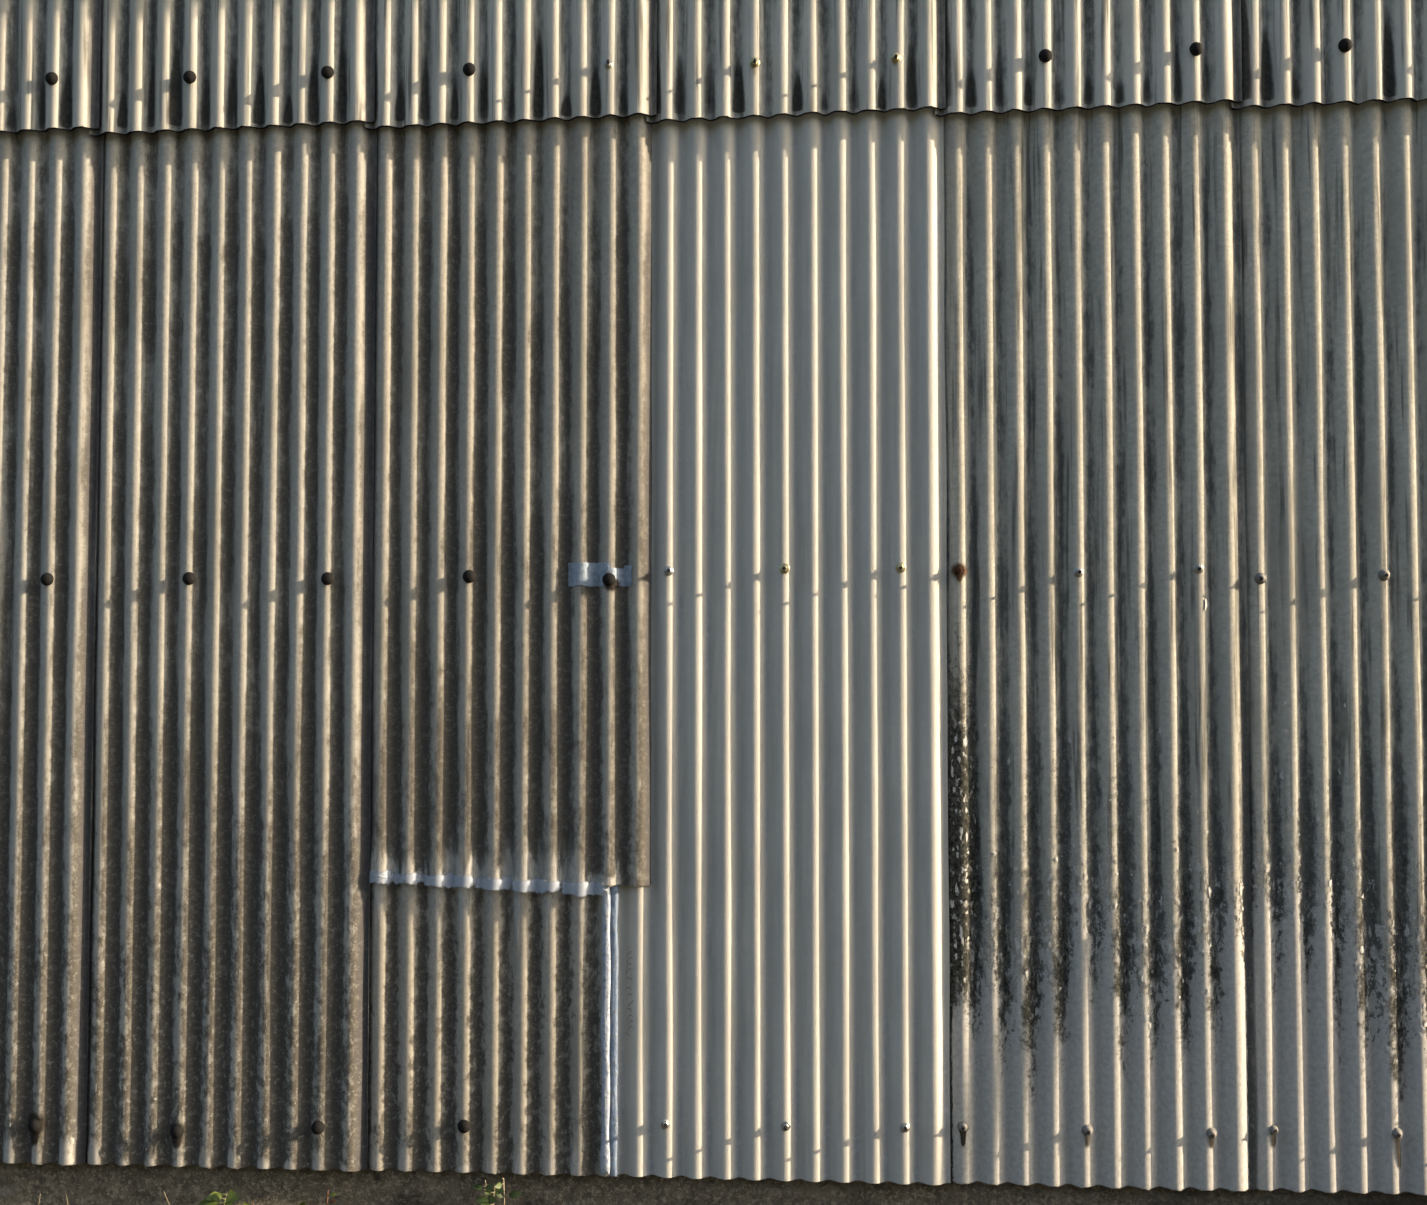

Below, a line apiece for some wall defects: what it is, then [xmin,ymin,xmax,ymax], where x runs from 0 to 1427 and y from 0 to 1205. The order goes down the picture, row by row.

water stain [967,674,1072,1092]
water stain [1090,829,1160,1070]
water stain [1174,836,1224,1049]
water stain [1333,873,1369,1048]
water stain [1387,828,1408,1168]